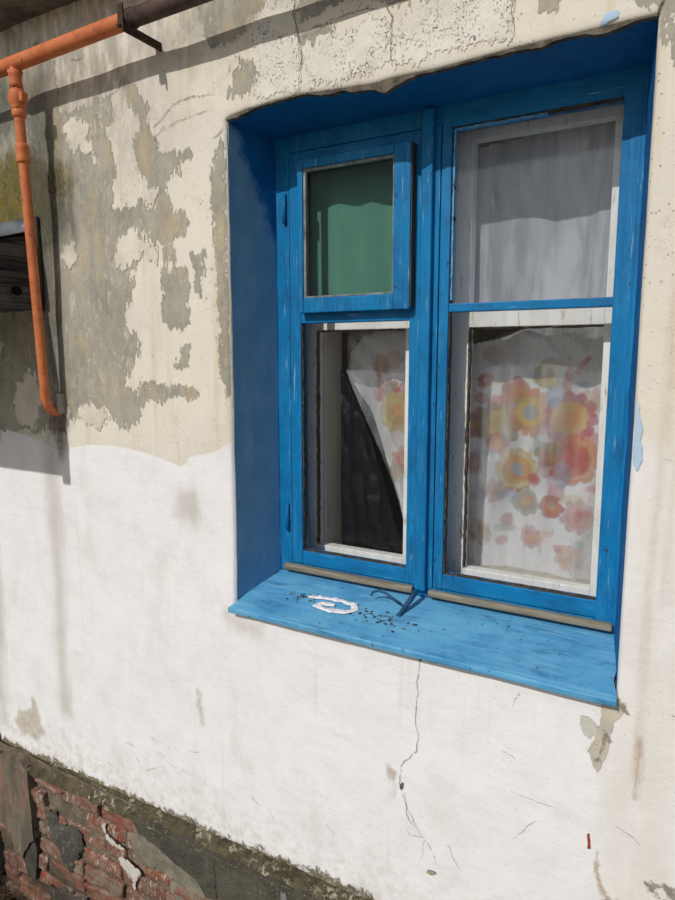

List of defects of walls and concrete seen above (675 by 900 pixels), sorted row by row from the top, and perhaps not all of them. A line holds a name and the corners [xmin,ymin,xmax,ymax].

peeling [197,0,675,122]
peeling [0,60,231,436]
crack [399,661,457,865]
peeling [580,699,629,773]
spalling [644,881,675,900]